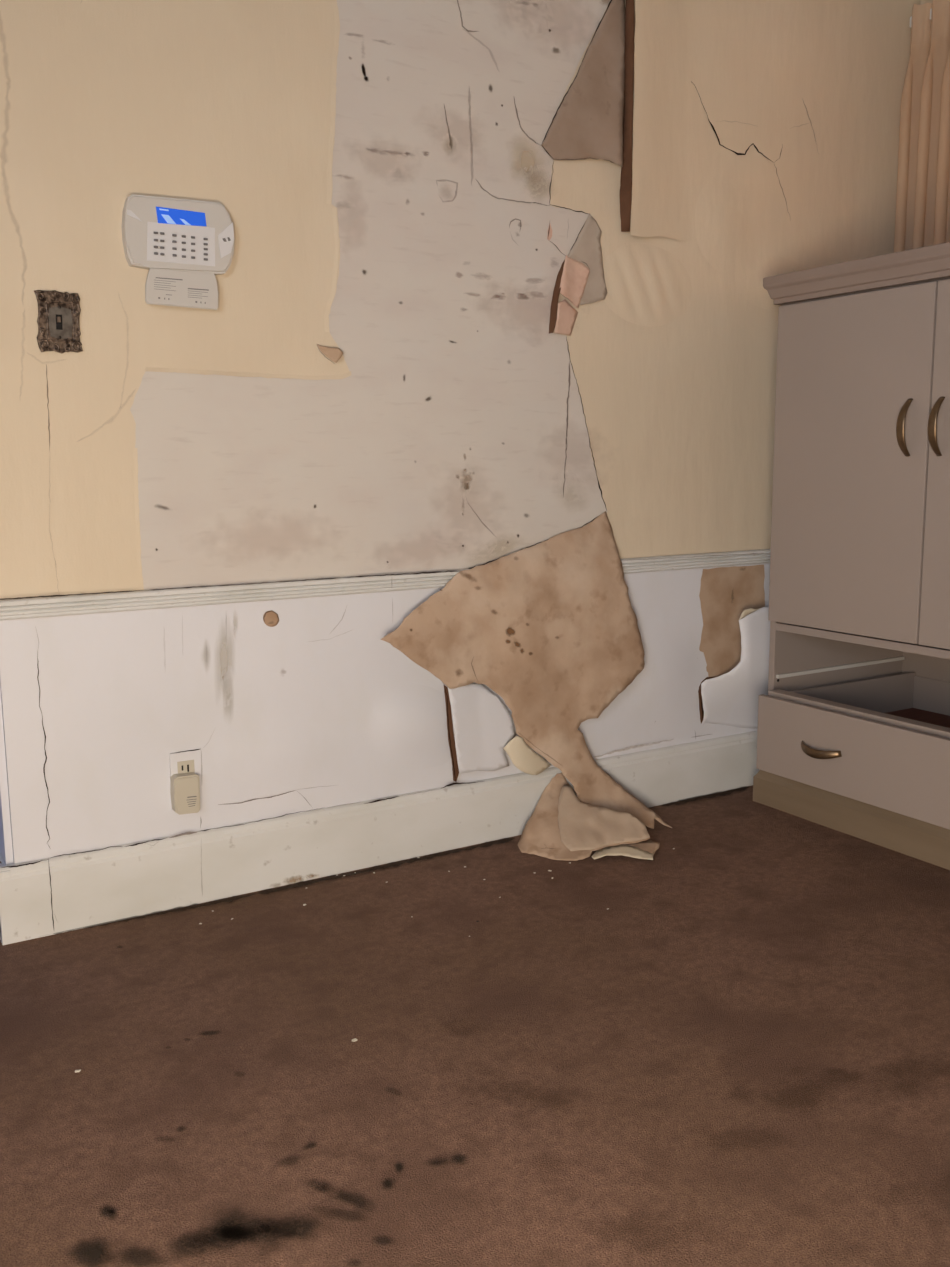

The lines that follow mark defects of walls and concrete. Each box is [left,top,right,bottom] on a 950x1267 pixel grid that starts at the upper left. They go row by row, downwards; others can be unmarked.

crack [696,89,790,215]
crack [44,365,52,450]
peeling [130,0,672,829]
peeling [699,565,765,677]
crack [1,656,322,928]